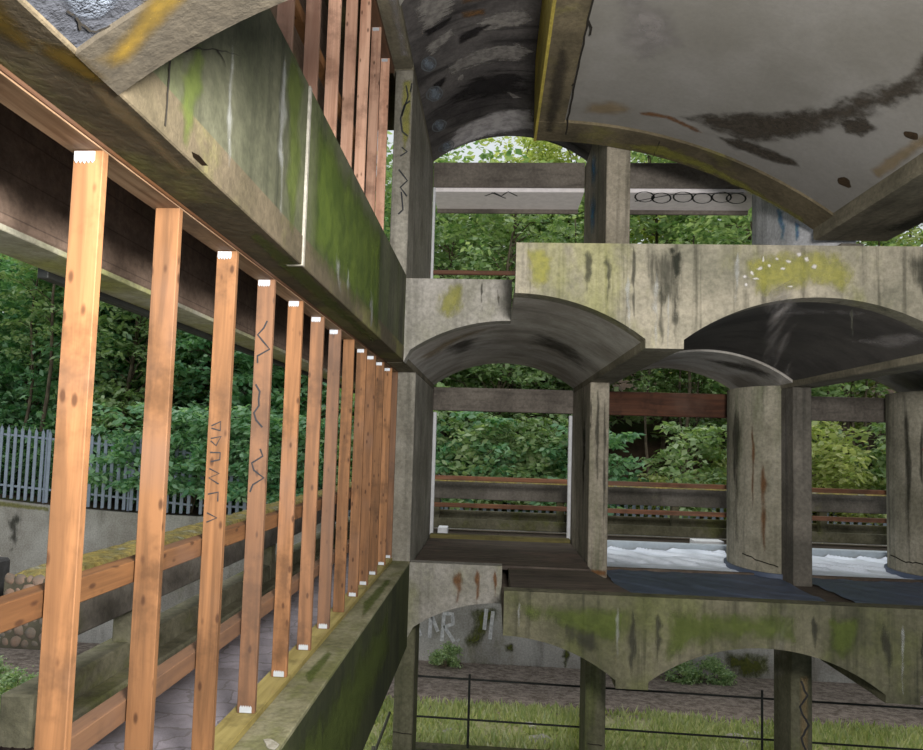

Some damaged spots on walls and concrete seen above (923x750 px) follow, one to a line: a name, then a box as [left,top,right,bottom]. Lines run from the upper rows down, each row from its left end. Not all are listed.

crack [165,47,239,126]
leakage [696,58,923,165]
leakage [651,248,680,306]